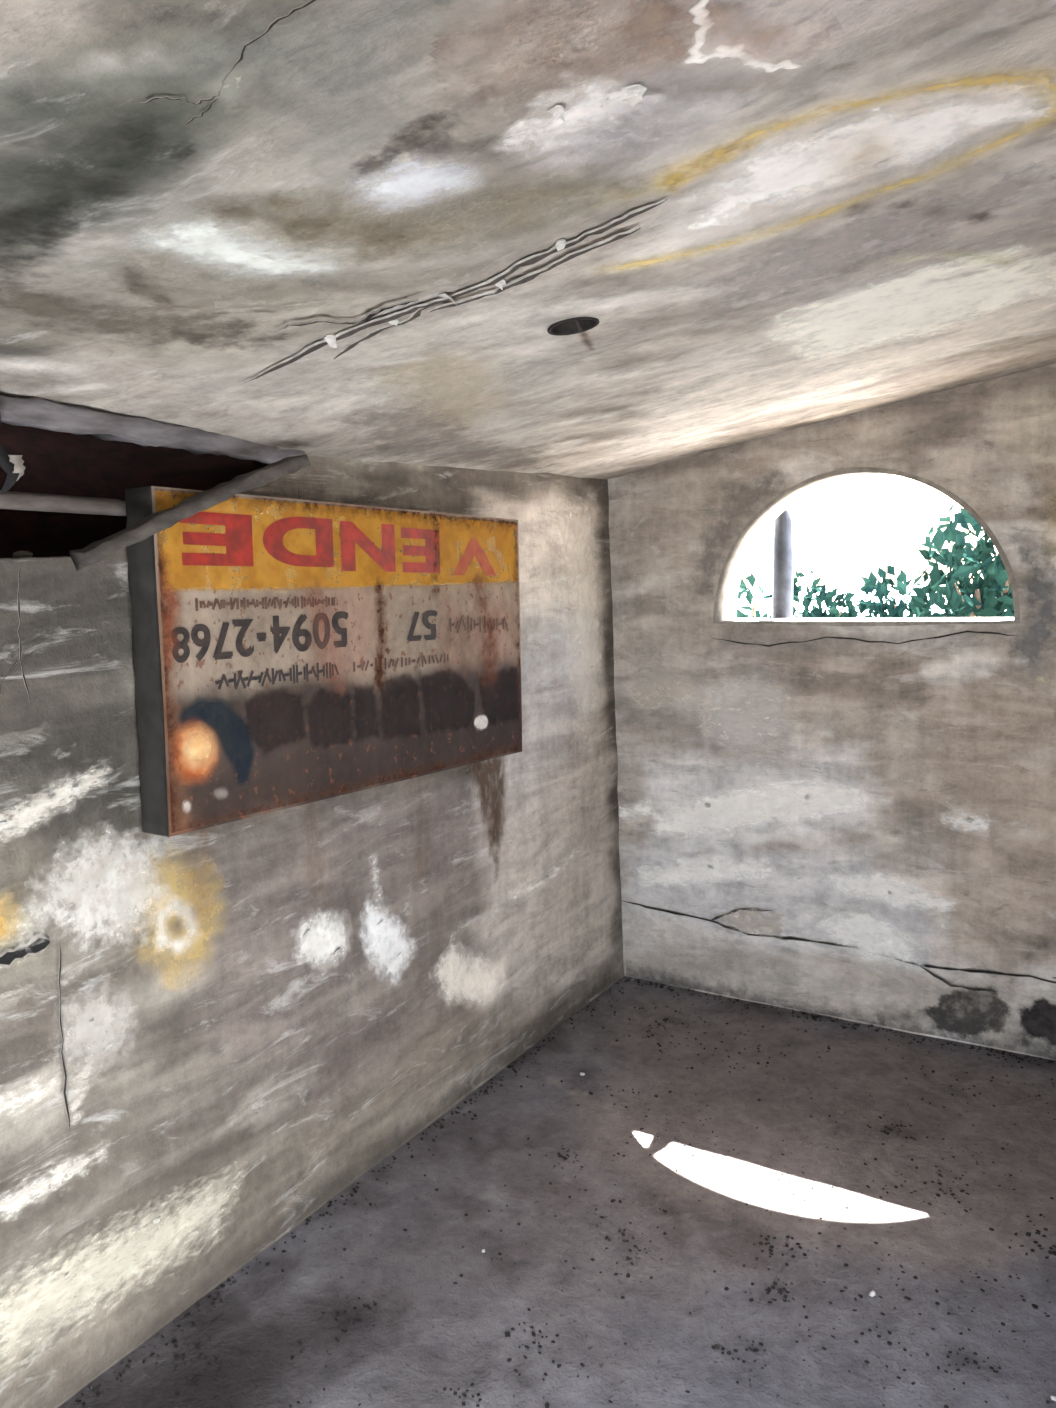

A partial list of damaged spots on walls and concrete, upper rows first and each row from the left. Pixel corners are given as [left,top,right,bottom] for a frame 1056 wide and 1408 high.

crack [140,0,316,125]
leakage [925,75,1056,112]
crack [243,199,667,383]
leakage [715,173,1029,304]
crack [621,900,1056,992]